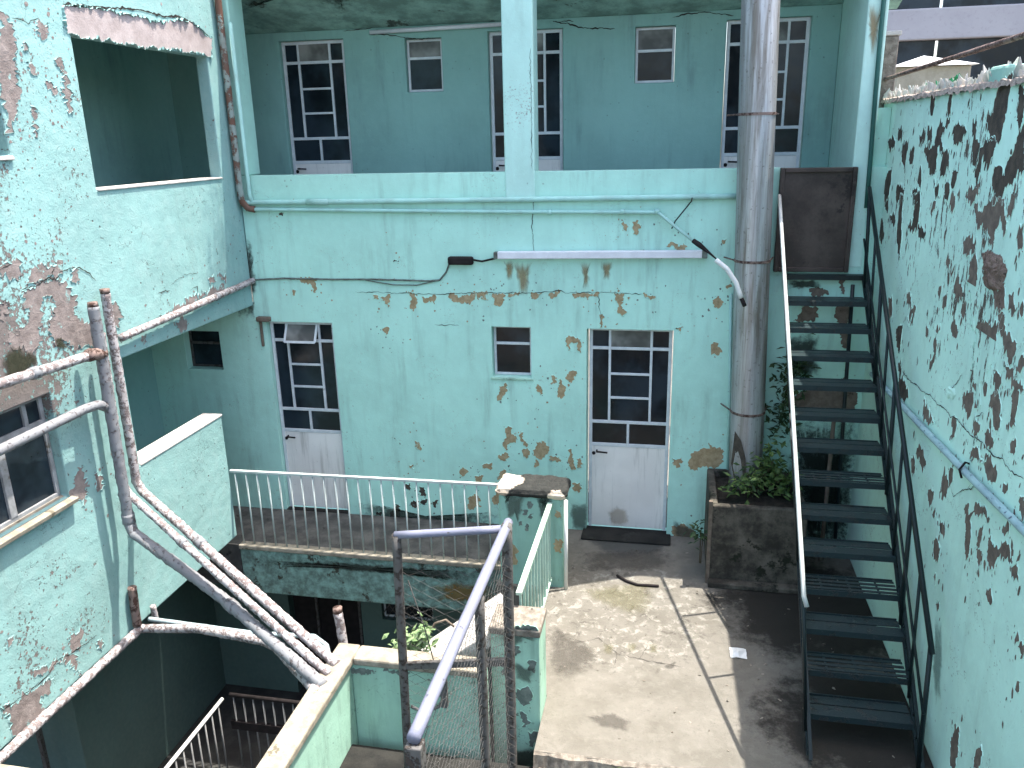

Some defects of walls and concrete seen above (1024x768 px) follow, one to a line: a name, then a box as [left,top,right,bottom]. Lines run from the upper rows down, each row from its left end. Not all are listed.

crack [553,20,614,29]
crack [676,10,733,18]
spalling [0,0,213,152]
peeling [0,237,94,359]
crack [366,290,640,327]
peeling [406,274,666,328]
peeling [879,71,1024,621]
peeling [394,422,438,514]
peeling [453,426,583,510]
crack [903,372,1022,478]
peeling [0,606,115,739]
peeling [950,716,984,768]